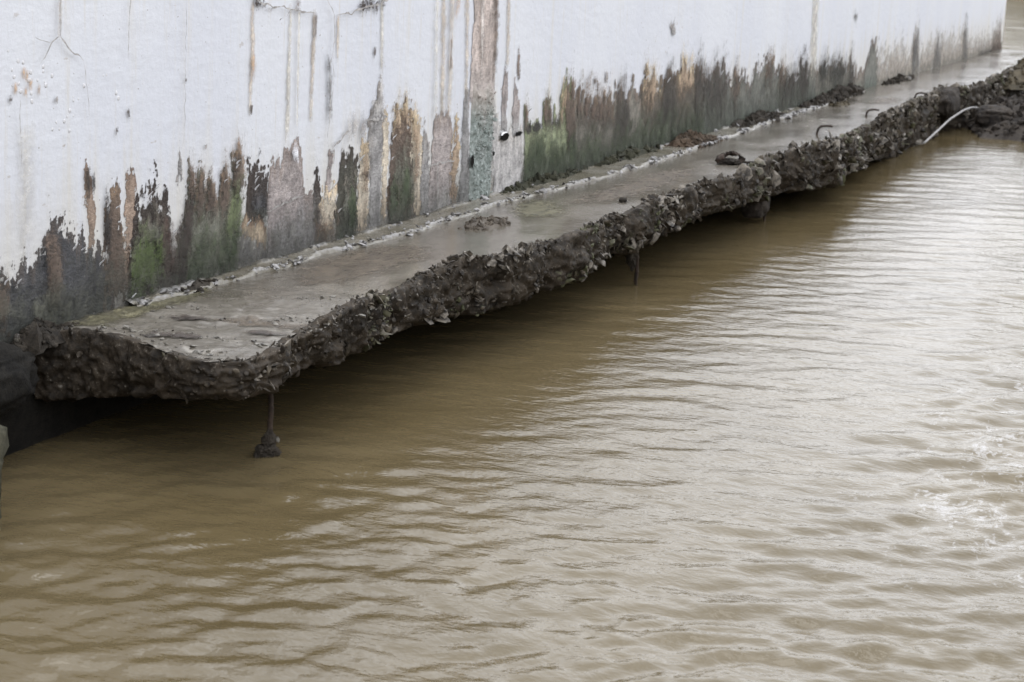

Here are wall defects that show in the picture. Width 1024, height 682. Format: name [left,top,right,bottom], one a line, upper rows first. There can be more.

crack [35,0,89,102]
leakage [38,0,523,322]
peeling [357,94,424,231]
peeling [573,53,761,171]
peeling [736,155,781,202]
peeling [815,42,868,96]
peeling [787,67,1024,173]
leakage [864,21,1001,88]
peeling [0,137,339,343]
peeling [331,281,485,356]
peeling [446,241,544,295]
peeling [556,185,698,287]